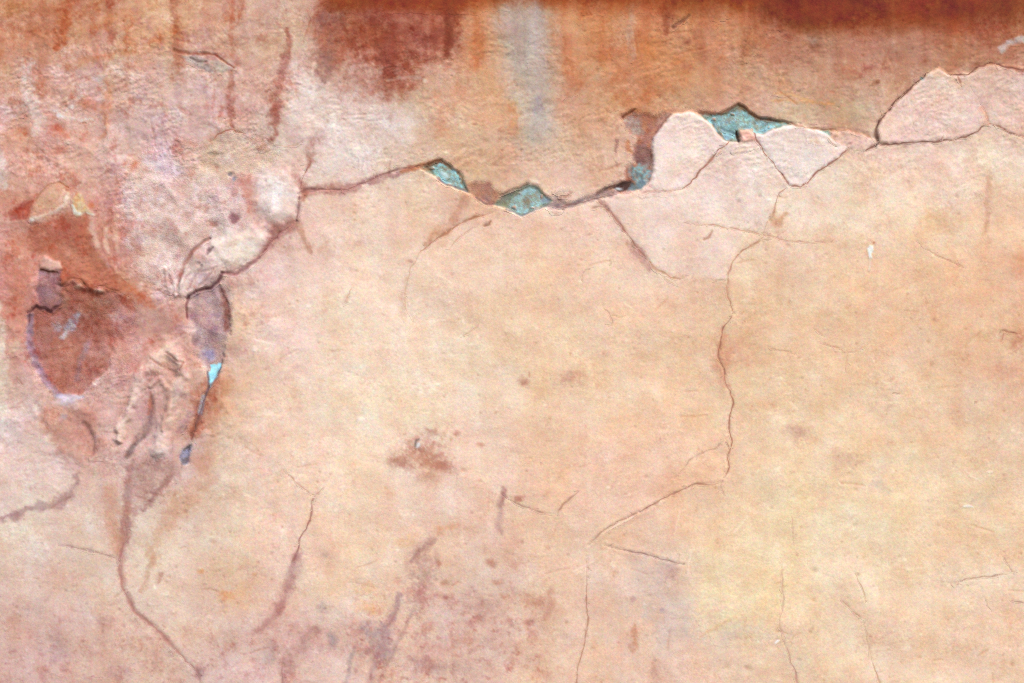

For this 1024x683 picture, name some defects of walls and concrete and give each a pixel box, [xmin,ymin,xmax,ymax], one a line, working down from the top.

corrosion [263,0,1024,139]
water stain [0,142,11,193]
water stain [0,299,26,439]
spalling [23,255,143,400]
water stain [85,210,130,283]
spalling [112,128,283,416]
flaking render [419,64,1024,284]
crack [548,59,1024,683]
spalling [178,442,194,467]
crack [59,520,205,683]